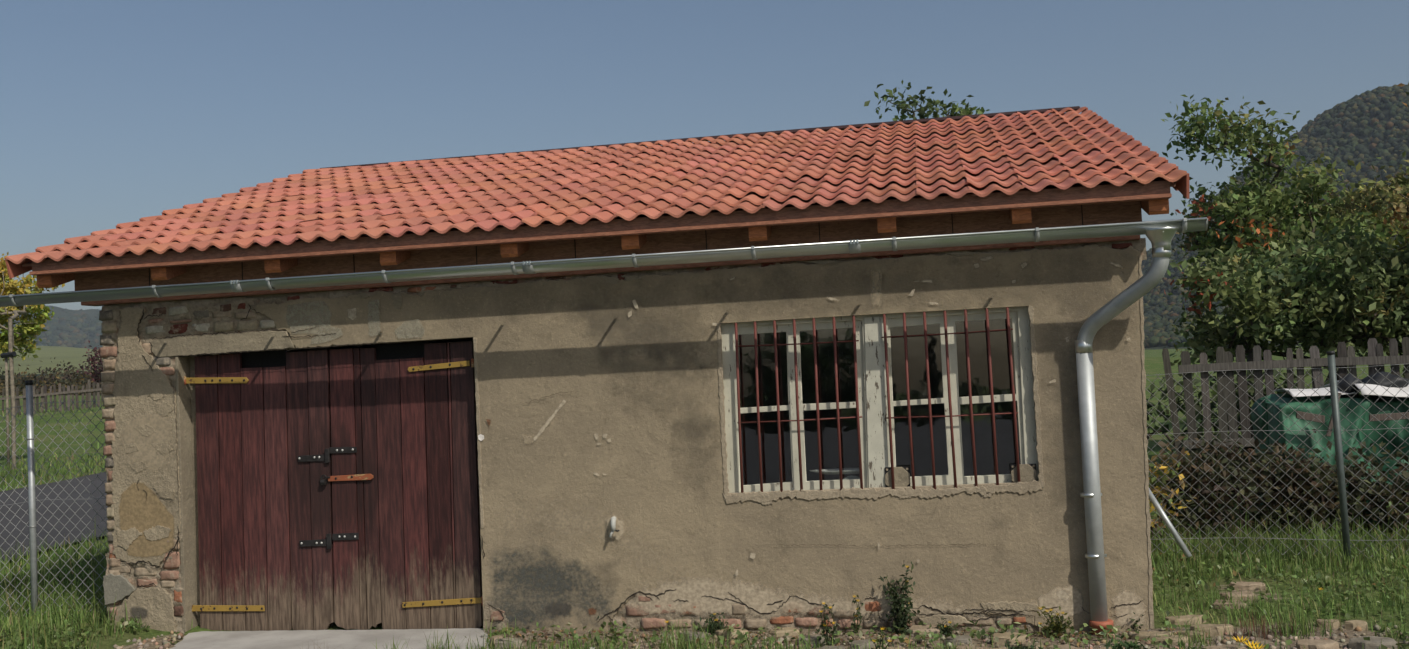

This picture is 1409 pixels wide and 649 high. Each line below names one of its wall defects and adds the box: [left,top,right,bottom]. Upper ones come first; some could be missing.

water stain [494,551,609,628]
flaking render [99,238,1147,633]
crack [598,589,829,625]
flaking render [1127,297,1154,629]